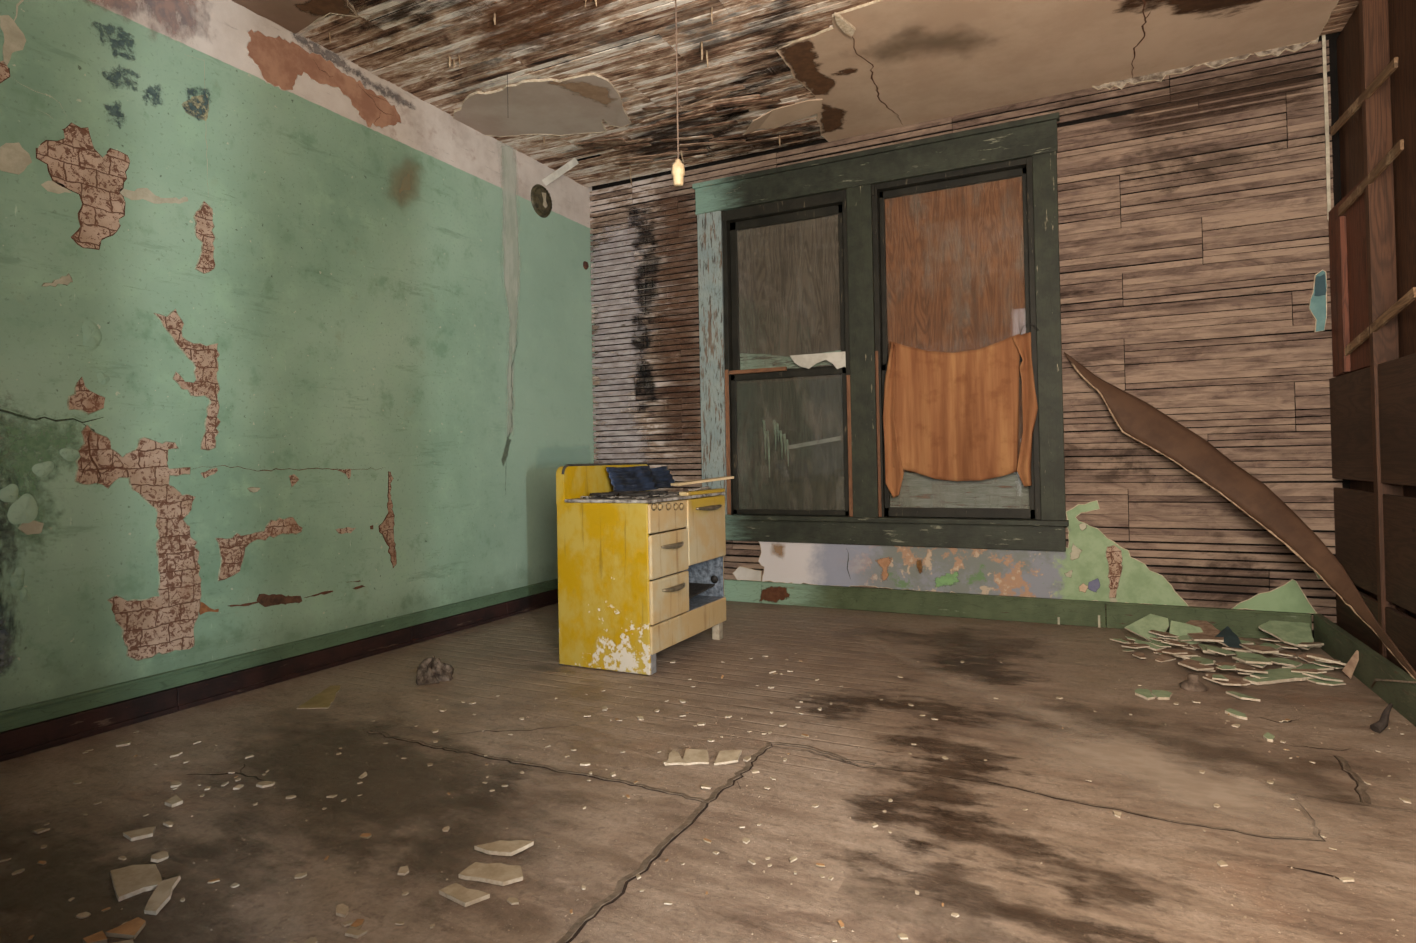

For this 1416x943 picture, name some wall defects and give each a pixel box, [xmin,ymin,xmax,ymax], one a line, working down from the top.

peeling [246,29,401,129]
crack [1129,0,1150,78]
leakage [1118,0,1262,15]
peeling [0,123,216,274]
peeling [154,309,221,451]
peeling [67,377,333,661]
leakage [0,837,238,943]
crack [188,764,257,777]
leakage [245,726,515,880]
crack [367,717,1416,943]
leakage [848,735,1150,903]
leakage [855,853,1160,943]